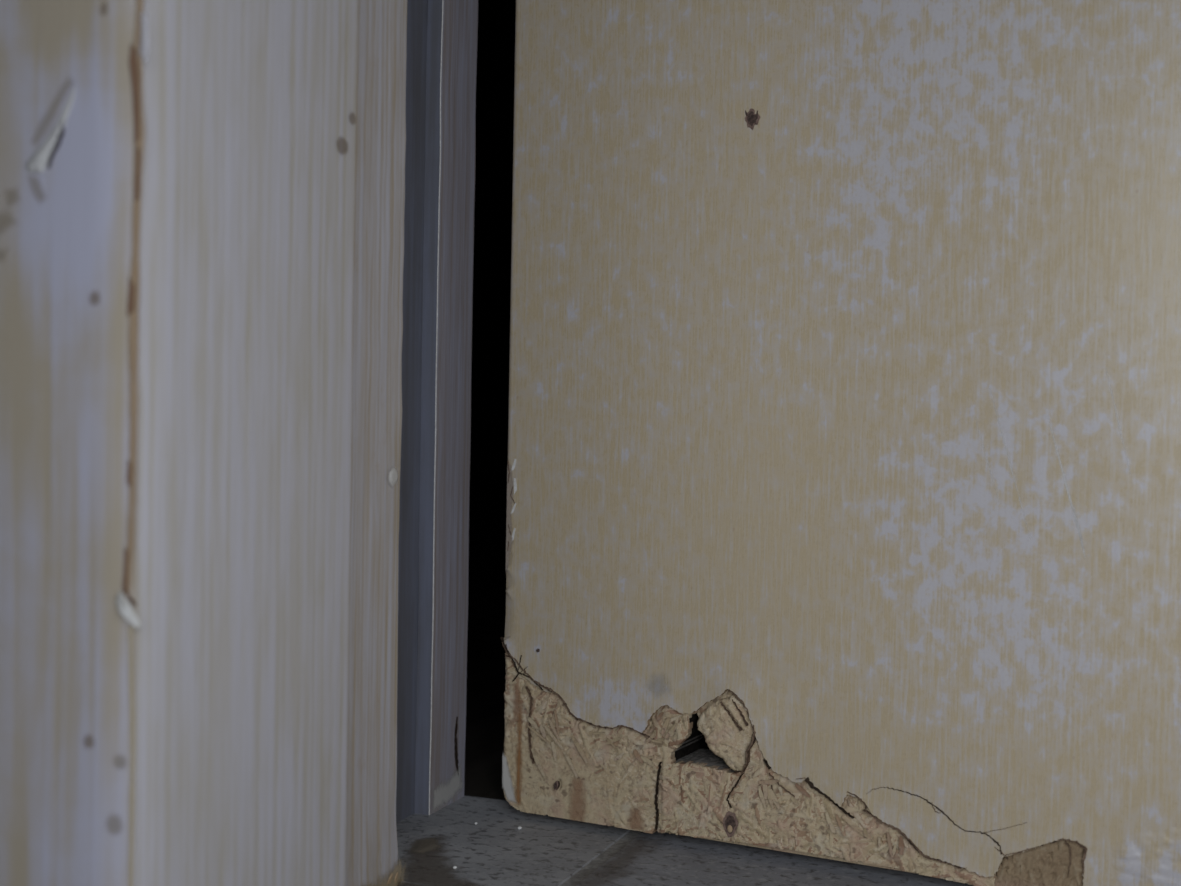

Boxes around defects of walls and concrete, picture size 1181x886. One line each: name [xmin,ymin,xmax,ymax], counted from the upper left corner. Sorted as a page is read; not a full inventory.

spalling [503,652,1088,886]
crack [720,689,1022,869]